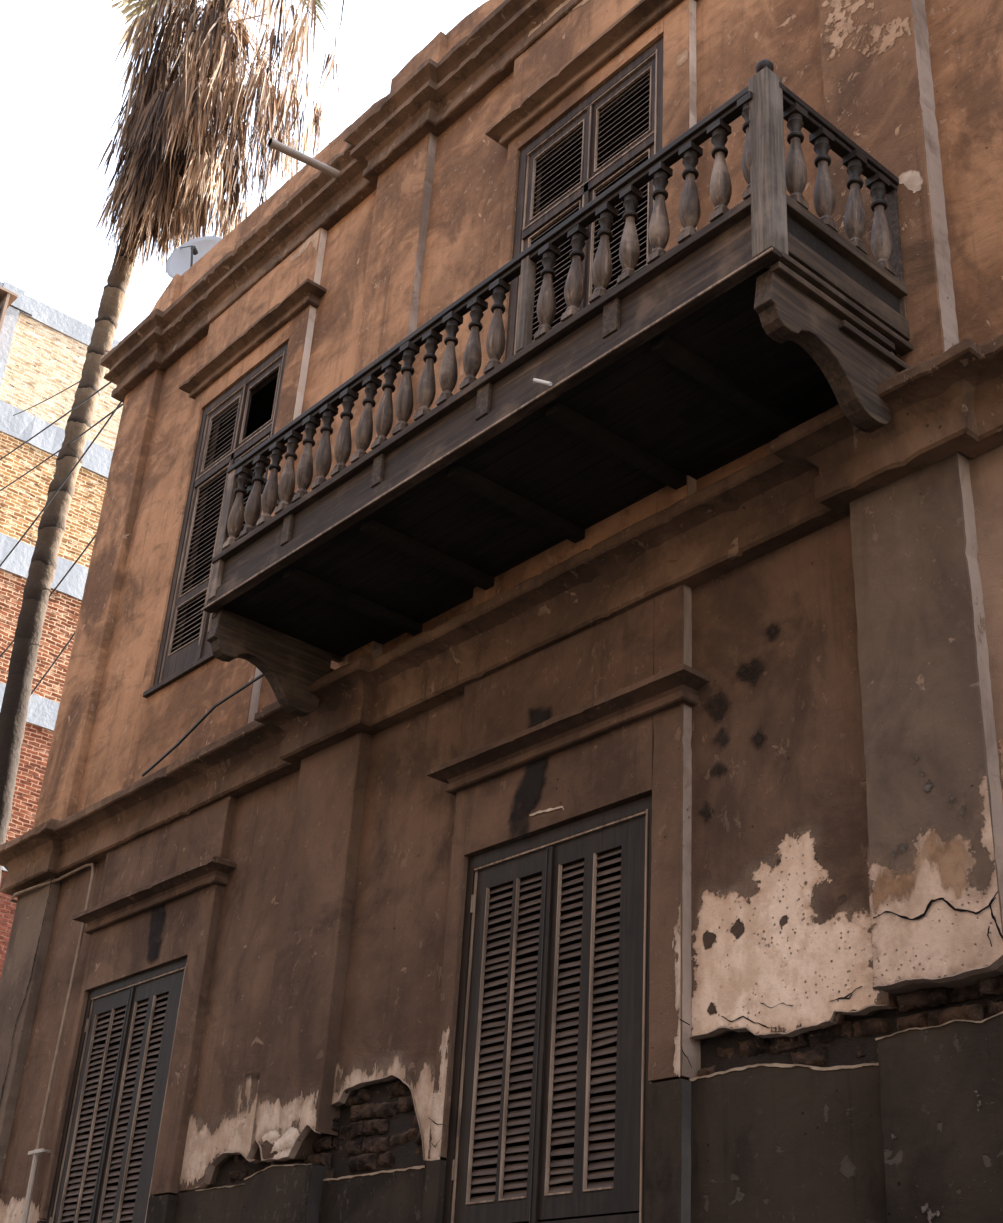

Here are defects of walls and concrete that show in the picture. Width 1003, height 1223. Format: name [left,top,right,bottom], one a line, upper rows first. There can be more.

peeling [818,0,912,61]
leakage [528,708,551,728]
leakage [509,756,548,837]
peeling [672,738,1003,1081]
crack [873,891,1003,947]
flaking render [180,1026,450,1191]